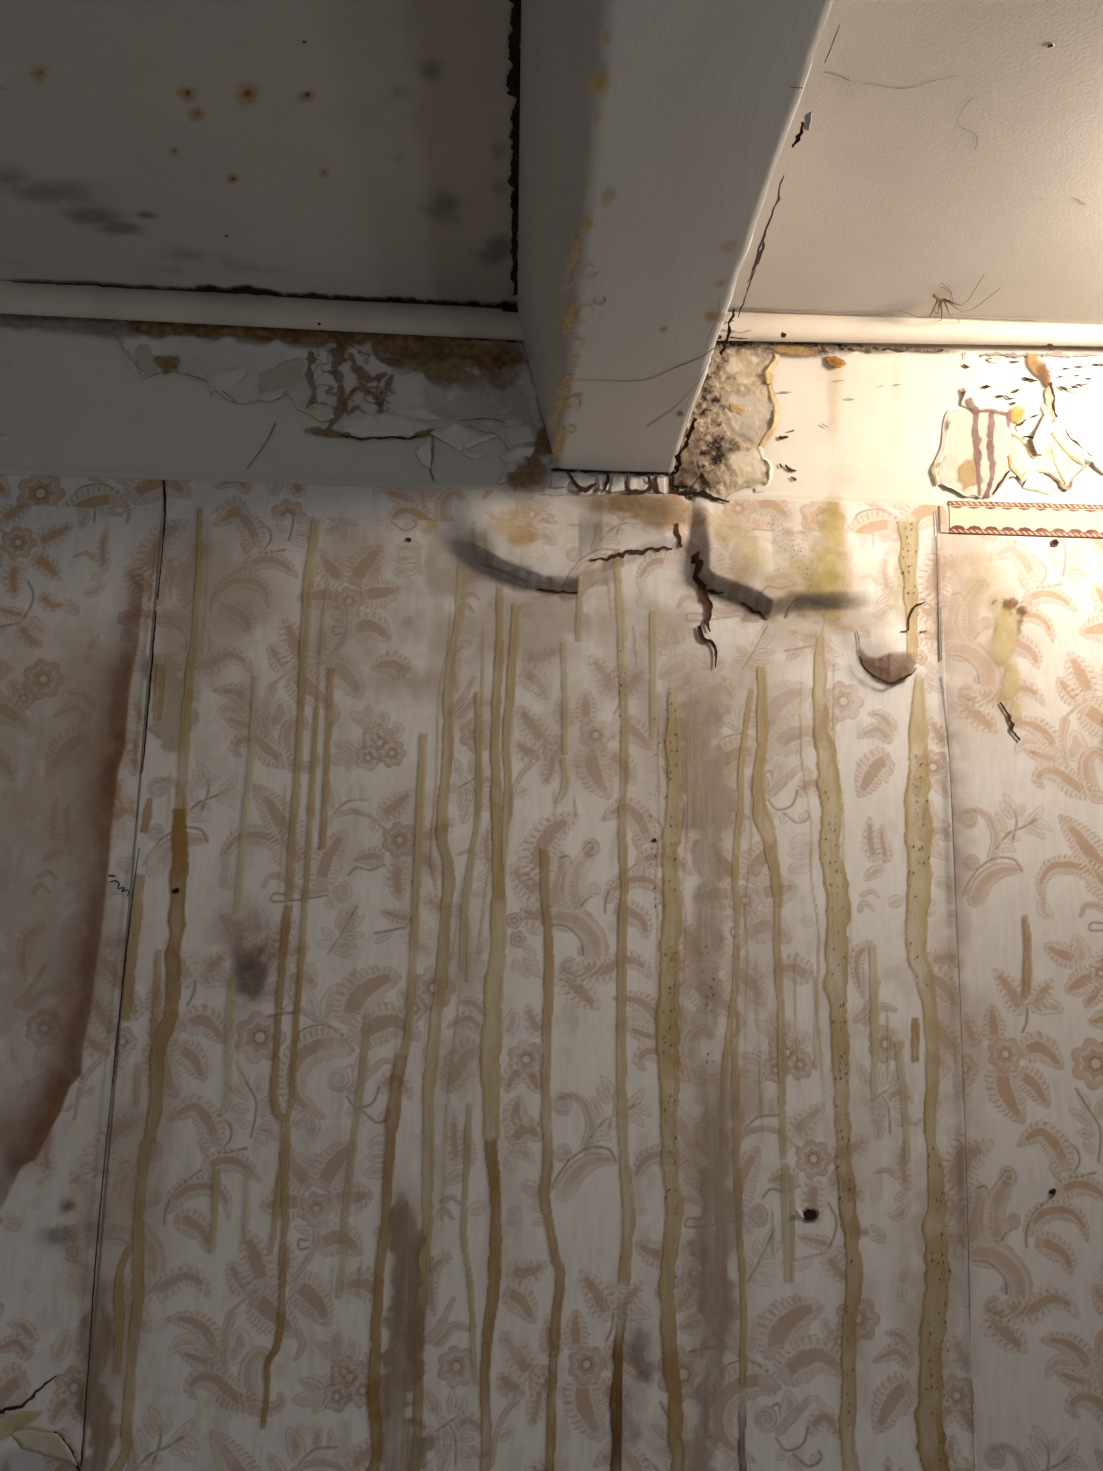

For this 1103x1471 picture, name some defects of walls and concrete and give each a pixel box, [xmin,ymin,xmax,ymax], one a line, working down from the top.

water stain [12,509,202,1471]
water stain [225,520,334,1428]
water stain [336,568,522,1471]
peeling [113,175,797,503]
water stain [539,850,565,1471]
water stain [547,549,635,1285]
crack [480,523,843,668]
water stain [610,612,795,1471]
peeling [792,111,812,148]
water stain [801,637,863,1471]
water stain [870,521,951,1471]
peeling [932,354,1103,498]